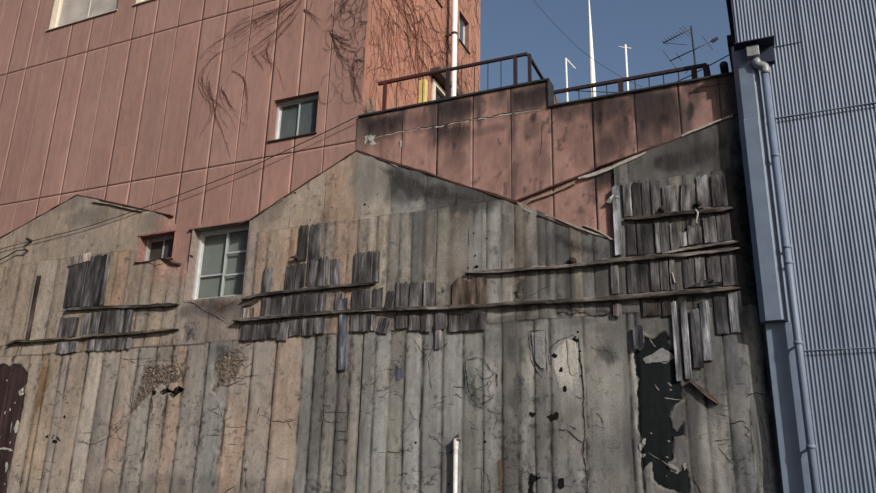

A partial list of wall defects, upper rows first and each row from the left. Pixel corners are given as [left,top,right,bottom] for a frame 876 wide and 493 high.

crack [366,108,544,139]
leakage [594,169,614,182]
peeling [0,363,28,493]
spalling [125,362,182,417]
spalling [213,350,252,390]
peeling [634,332,691,493]